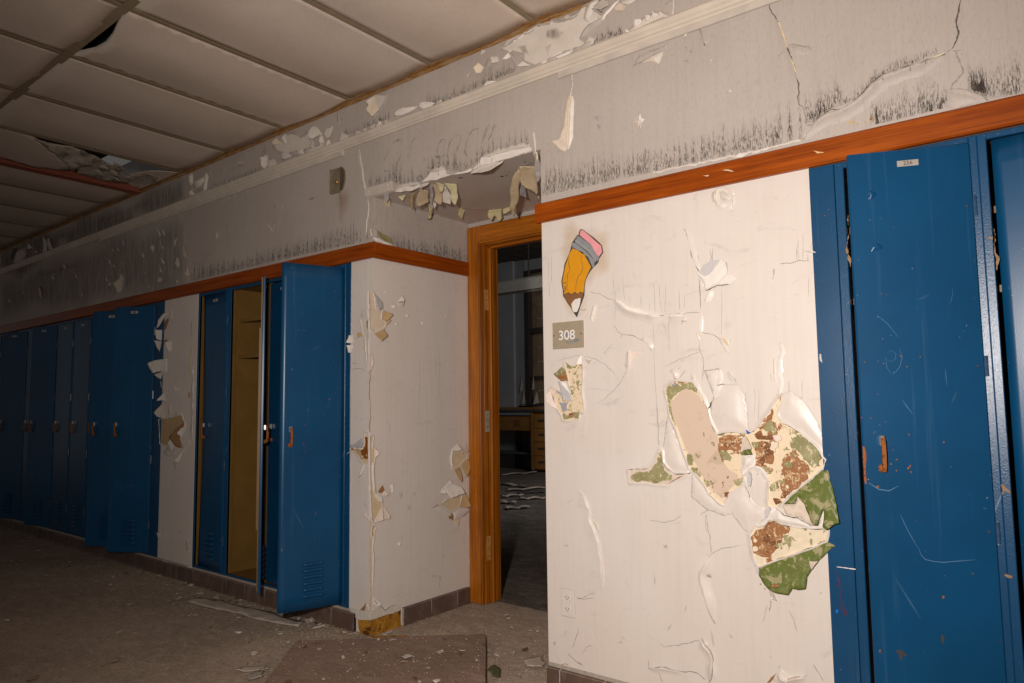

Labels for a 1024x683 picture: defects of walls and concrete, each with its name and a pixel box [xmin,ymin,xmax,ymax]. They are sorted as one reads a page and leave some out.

peeling [466,0,636,86]
crack [769,0,988,142]
peeling [260,93,442,169]
peeling [384,143,541,225]
damp [540,106,821,190]
peeling [711,185,736,212]
peeling [346,280,393,394]
spalling [545,351,641,424]
crack [604,326,698,381]
spalling [434,443,471,532]
spalling [590,291,830,624]
crack [648,640,705,682]